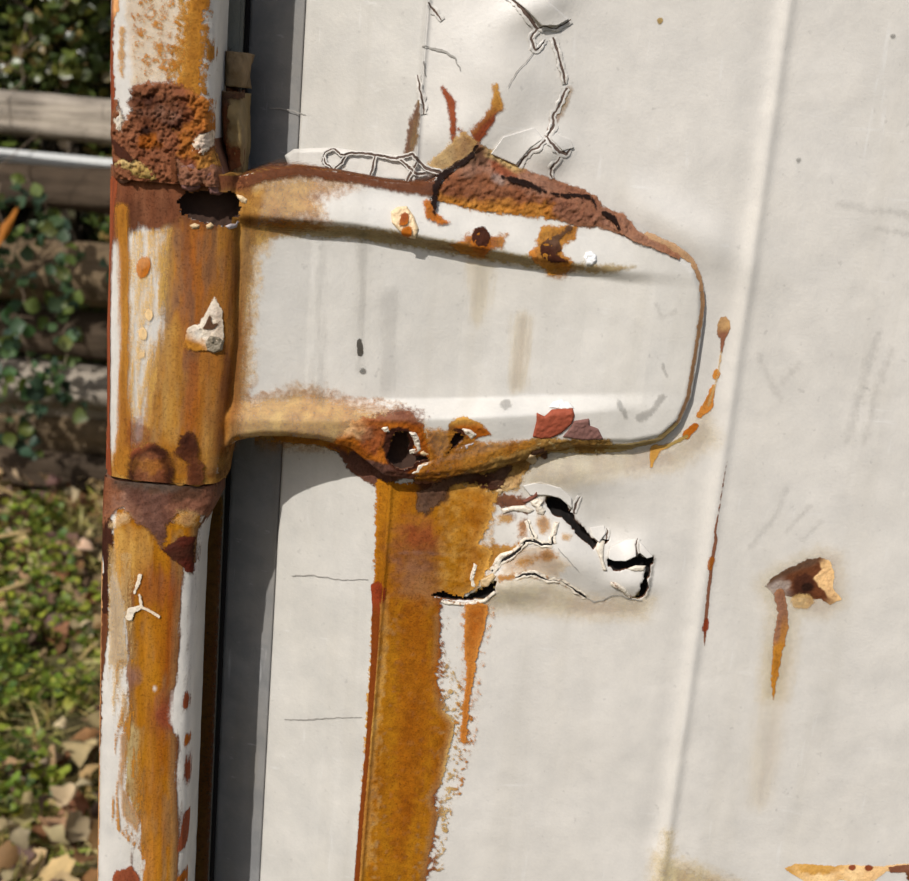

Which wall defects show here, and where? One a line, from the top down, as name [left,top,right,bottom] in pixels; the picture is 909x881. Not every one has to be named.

crack [427,0,445,22]
crack [415,45,460,114]
crack [507,0,573,179]
crack [320,147,442,182]
spalling [177,190,242,227]
peeling [184,297,224,351]
corrosion [98,0,730,881]
spalling [522,482,653,598]
spalling [431,542,524,599]